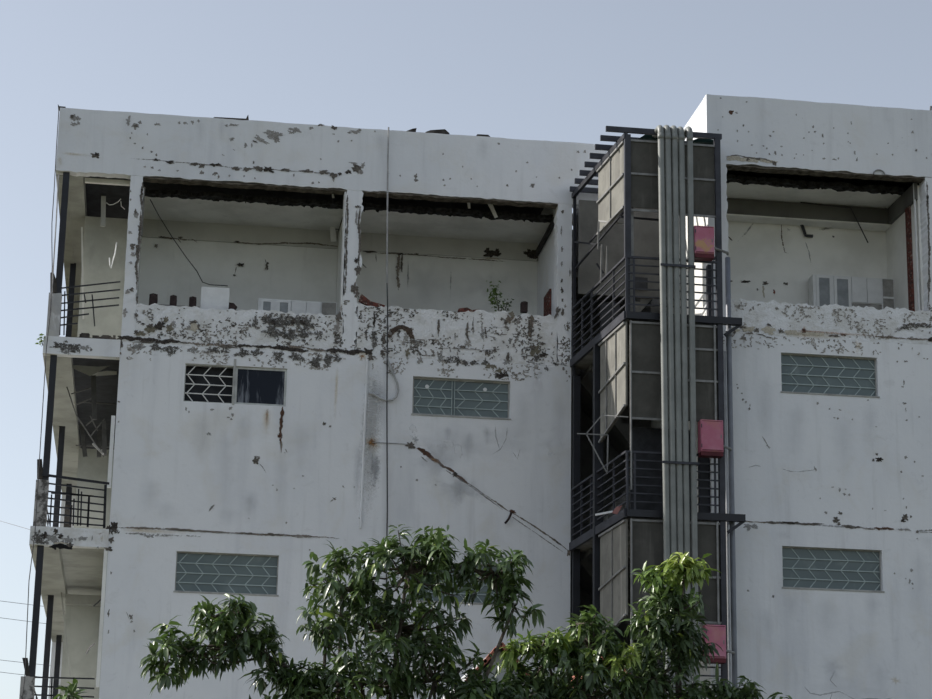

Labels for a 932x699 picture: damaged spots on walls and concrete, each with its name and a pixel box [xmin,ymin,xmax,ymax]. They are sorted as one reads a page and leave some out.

peeling [230,124,339,150]
spalling [727,131,783,166]
spalling [345,162,365,174]
flaking render [723,181,932,360]
crack [405,442,570,556]
crack [744,521,932,533]
spalling [49,541,73,550]